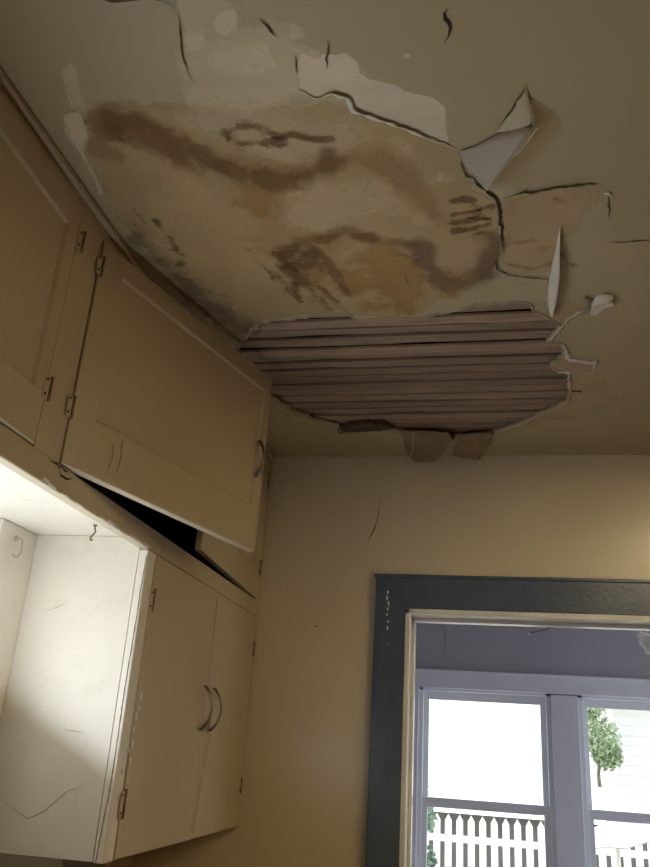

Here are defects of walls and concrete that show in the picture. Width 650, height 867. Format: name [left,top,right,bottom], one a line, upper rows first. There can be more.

crack [105,0,137,8]
crack [158,0,194,83]
crack [443,7,452,45]
peeling [299,53,452,147]
leakage [84,93,503,340]
flaking render [236,183,626,462]
peeling [63,859,105,867]